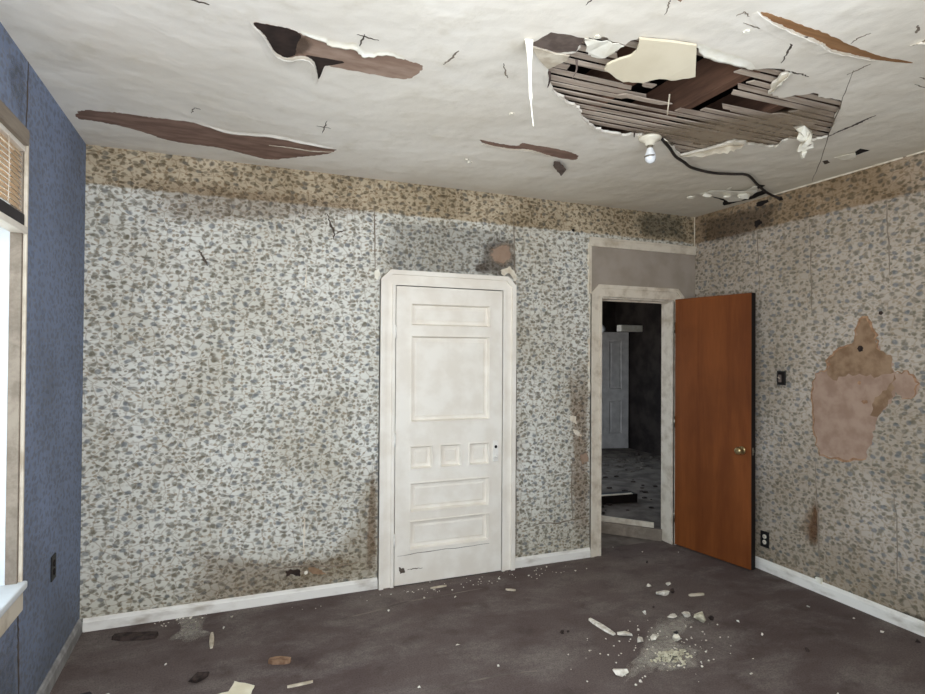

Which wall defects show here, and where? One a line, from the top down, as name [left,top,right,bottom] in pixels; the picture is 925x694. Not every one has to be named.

peeling [250,22,423,85]
crack [737,11,925,181]
peeling [75,110,339,160]
peeling [480,140,578,176]
peeling [794,124,813,158]
peeling [490,245,511,264]
flaking render [811,311,920,462]